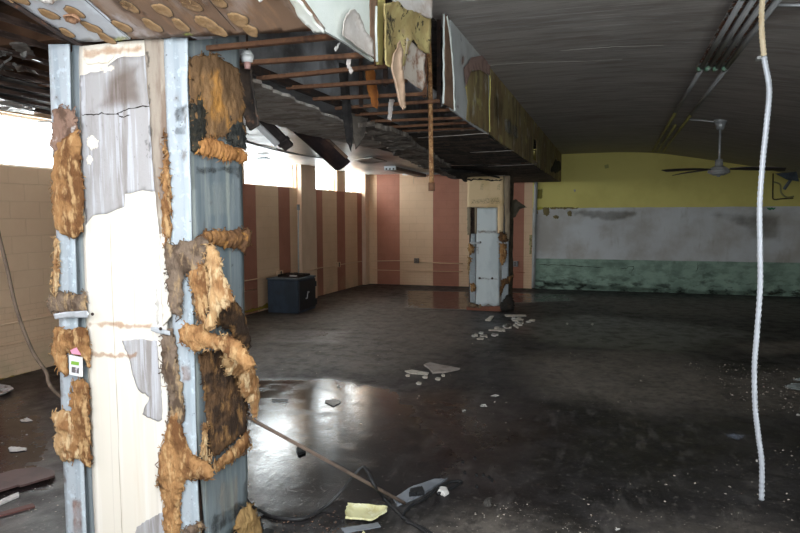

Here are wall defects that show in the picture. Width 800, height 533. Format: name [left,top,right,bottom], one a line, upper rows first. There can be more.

peeling [79,52,155,224]
peeling [122,339,162,422]
peeling [135,513,164,533]